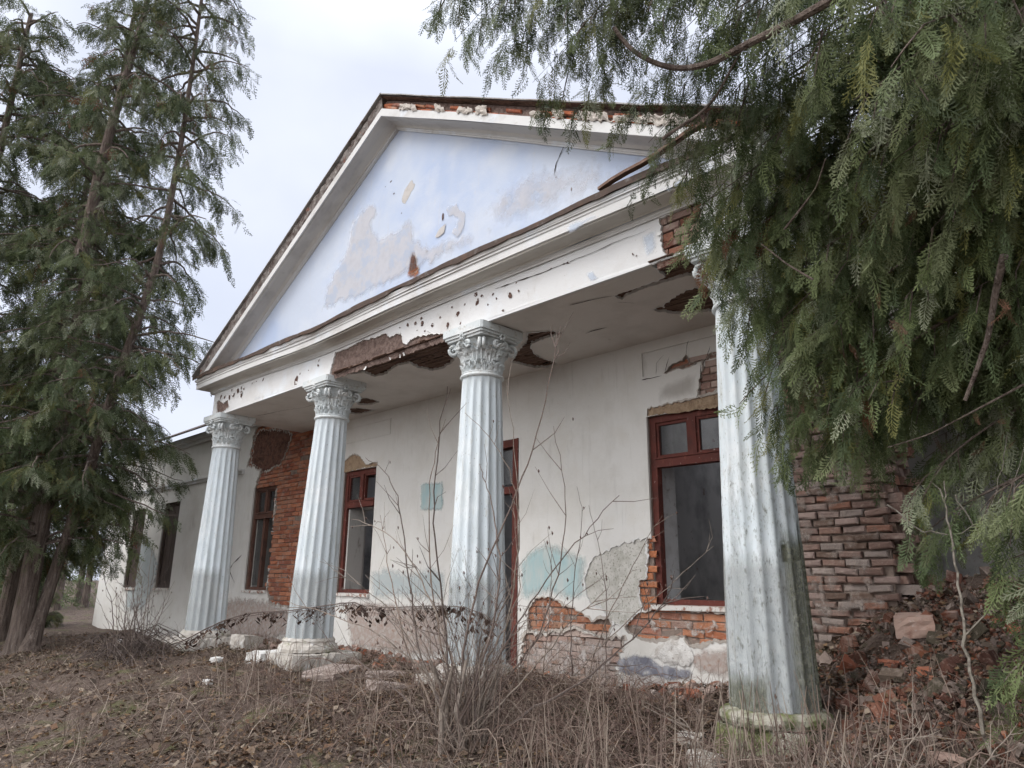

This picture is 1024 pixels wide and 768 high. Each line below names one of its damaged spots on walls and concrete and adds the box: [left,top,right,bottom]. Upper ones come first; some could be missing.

flaking render [382,101,750,130]
peeling [326,180,465,305]
flaking render [615,201,713,314]
flaking render [294,282,519,385]
flaking render [512,330,564,368]
flaking render [647,352,718,416]
flaking render [344,453,378,473]
flaking render [772,298,907,649]
flaking render [225,426,314,638]
peeling [519,536,728,689]